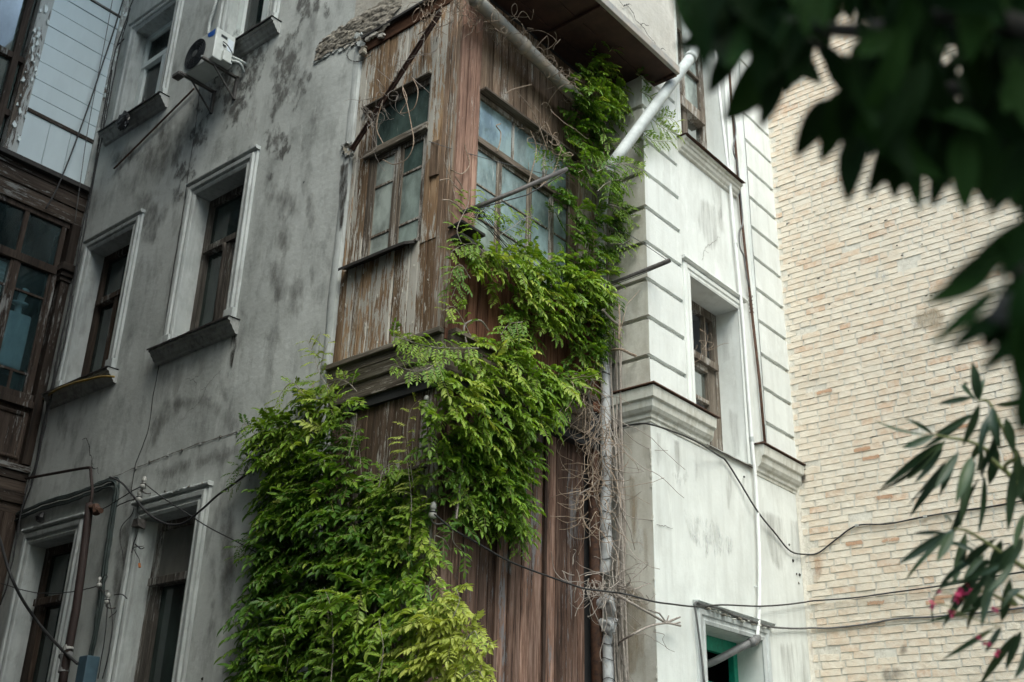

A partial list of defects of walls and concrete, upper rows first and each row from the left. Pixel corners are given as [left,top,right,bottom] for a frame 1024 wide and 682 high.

peeling [11,4,49,142]
leakage [213,0,329,158]
spalling [313,0,402,64]
leakage [145,105,208,199]